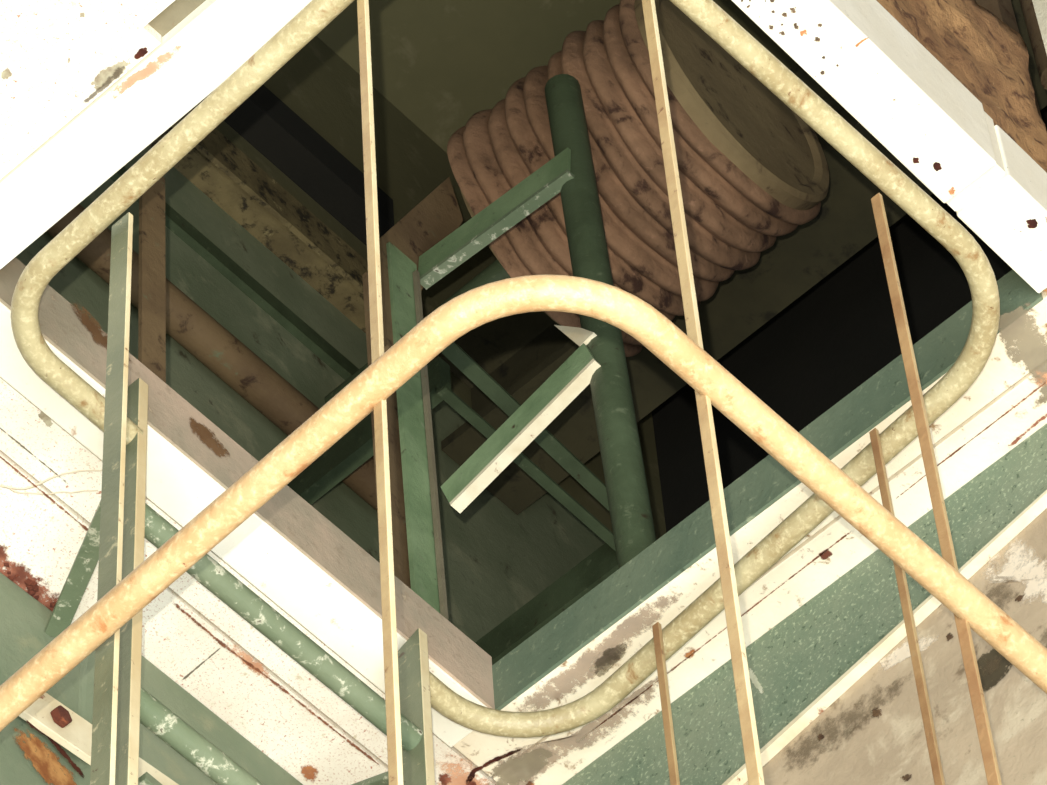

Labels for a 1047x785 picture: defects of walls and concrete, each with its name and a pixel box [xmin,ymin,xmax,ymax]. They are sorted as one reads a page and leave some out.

leakage [998,304,1047,403]
rust [14,721,84,785]
rust [439,749,521,785]